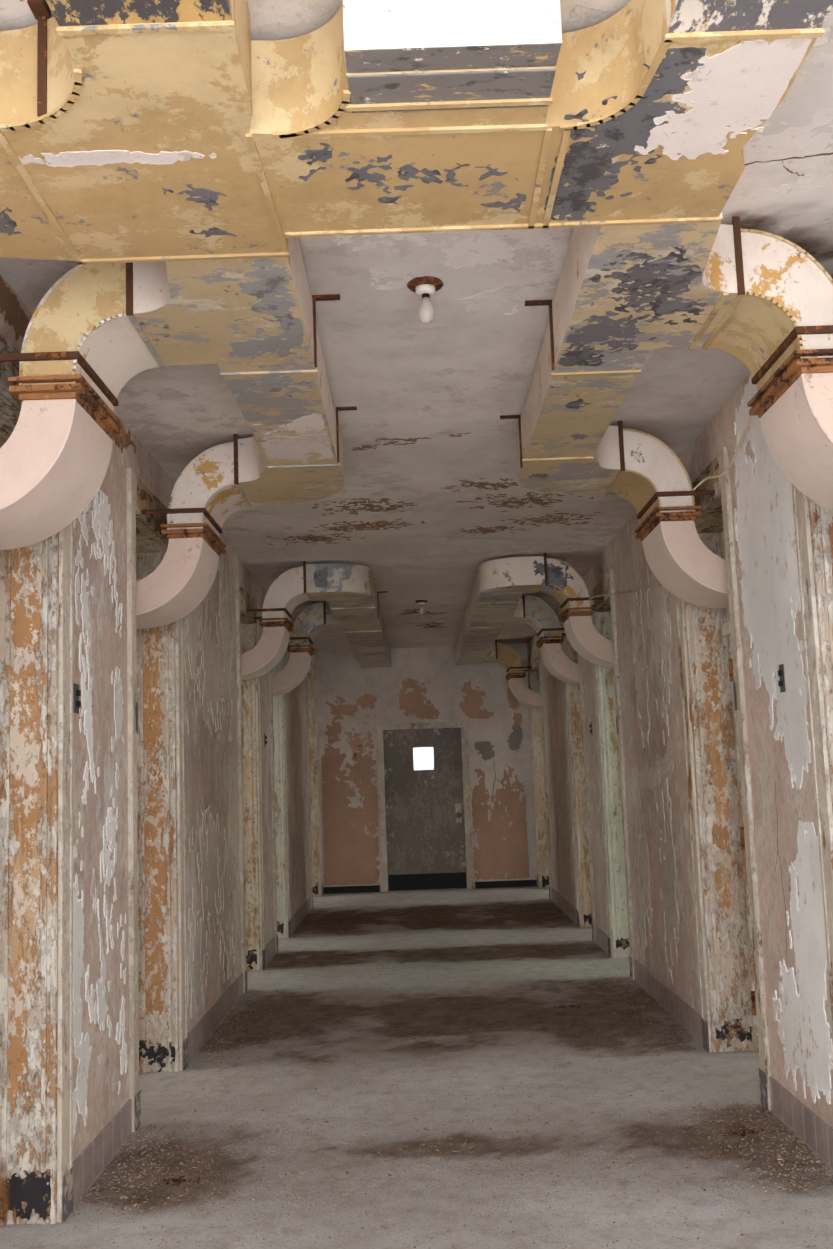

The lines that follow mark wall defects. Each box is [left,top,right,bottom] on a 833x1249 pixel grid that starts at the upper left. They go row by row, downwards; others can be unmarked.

peeling [298,143,332,182]
peeling [345,154,508,204]
peeling [544,7,833,221]
crack [745,153,833,176]
peeling [558,246,708,367]
peeling [734,375,811,789]
peeling [7,546,42,1122]
peeling [73,488,128,1139]
peeling [143,627,167,1015]
peeling [321,693,380,886]
peeling [772,820,833,1105]
rust [0,1165,16,1225]